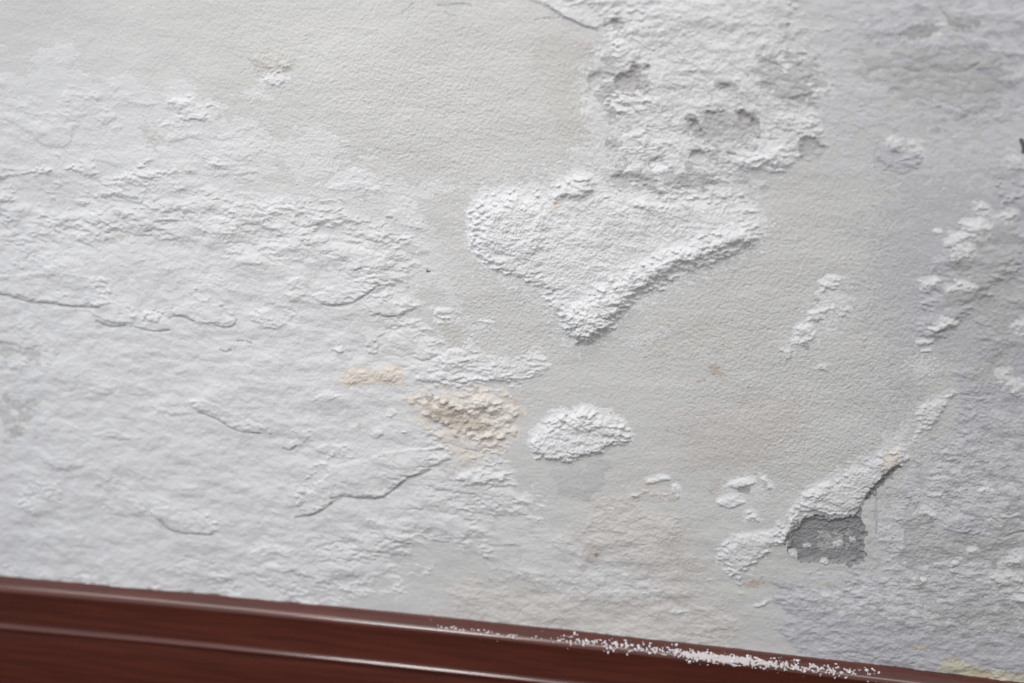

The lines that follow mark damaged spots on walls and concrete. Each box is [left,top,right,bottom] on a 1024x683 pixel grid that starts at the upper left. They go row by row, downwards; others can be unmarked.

water stain [0,197,754,648]
water stain [455,0,1024,682]
flaking render [784,416,1024,657]